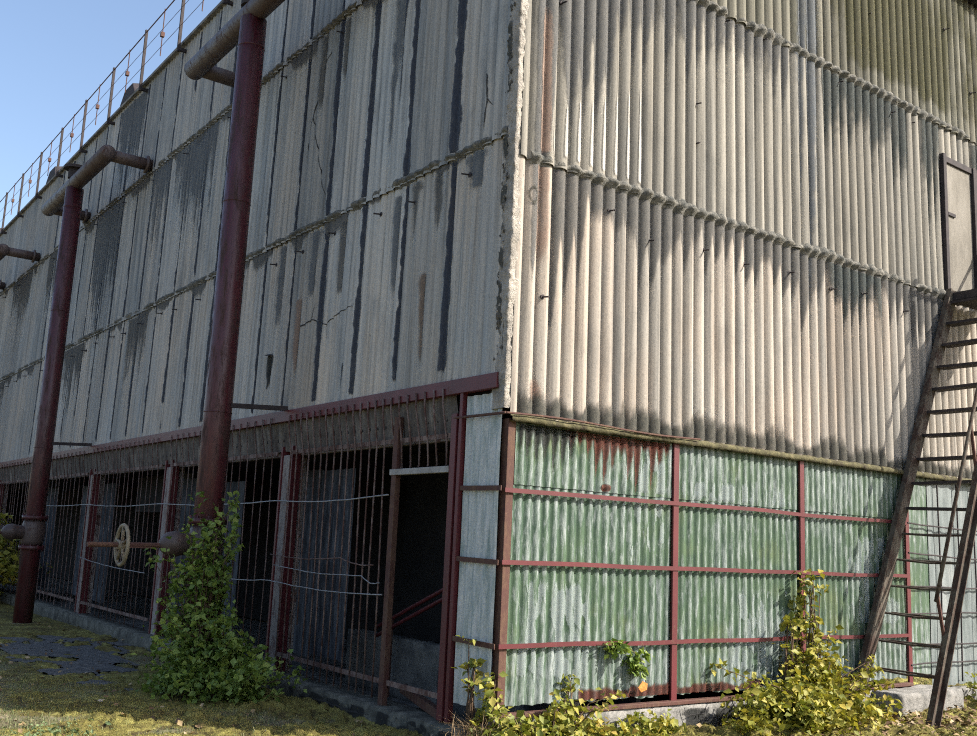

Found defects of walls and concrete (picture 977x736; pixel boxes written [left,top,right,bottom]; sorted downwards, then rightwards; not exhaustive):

water stain [389,0,417,177]
water stain [449,50,464,153]
corrosion [541,15,553,152]
water stain [87,81,224,436]
water stain [275,222,347,406]
water stain [340,265,363,394]
water stain [437,248,452,371]
corrosion [531,382,541,400]
corrosion [536,167,549,255]
water stain [520,424,576,472]
corrosion [569,431,670,492]
water stain [529,0,950,348]